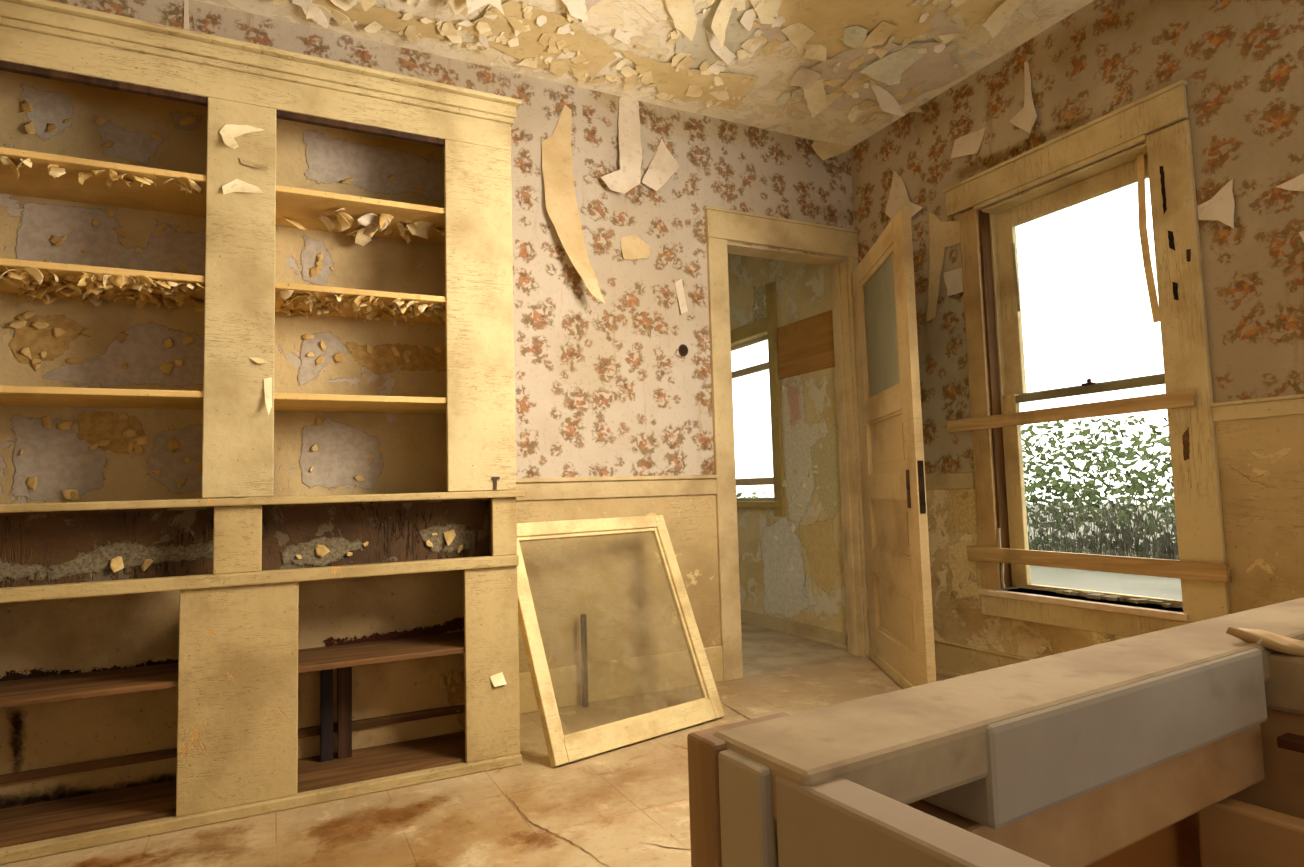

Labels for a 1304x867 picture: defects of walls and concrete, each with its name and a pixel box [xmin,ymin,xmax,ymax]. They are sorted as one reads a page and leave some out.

peeling [273,0,1026,126]
peeling [0,116,202,196]
peeling [219,124,268,195]
peeling [303,129,444,202]
peeling [0,202,206,388]
peeling [276,208,446,385]
peeling [249,357,272,415]
peeling [11,411,203,502]
peeling [299,417,385,491]
peeling [761,380,830,619]
peeling [0,538,213,582]
crack [506,794,609,867]